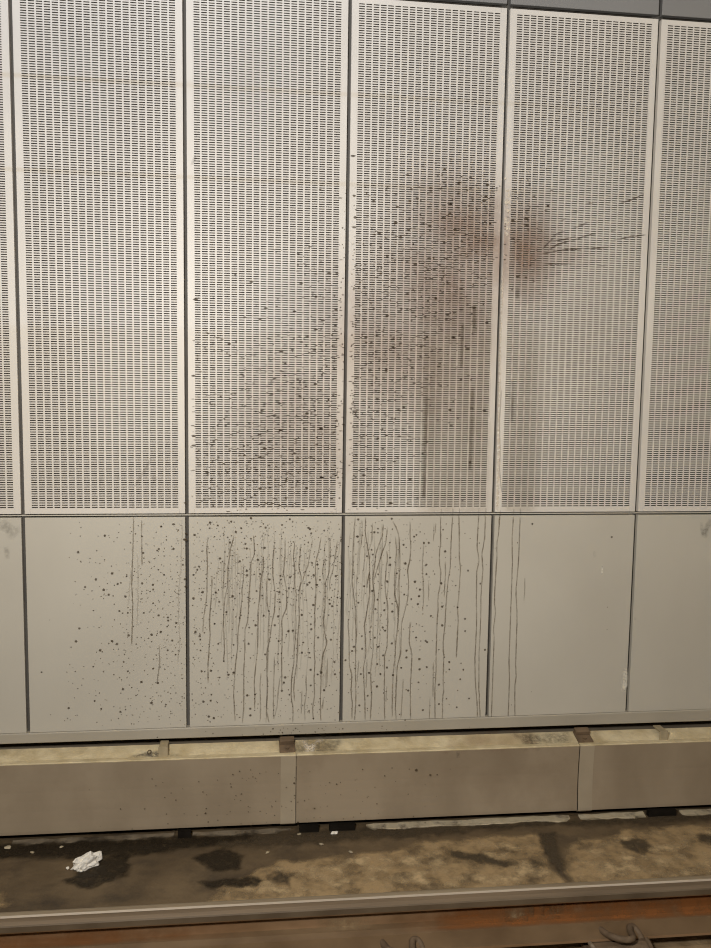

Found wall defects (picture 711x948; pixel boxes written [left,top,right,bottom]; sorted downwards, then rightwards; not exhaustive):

water stain [72,159,606,752]